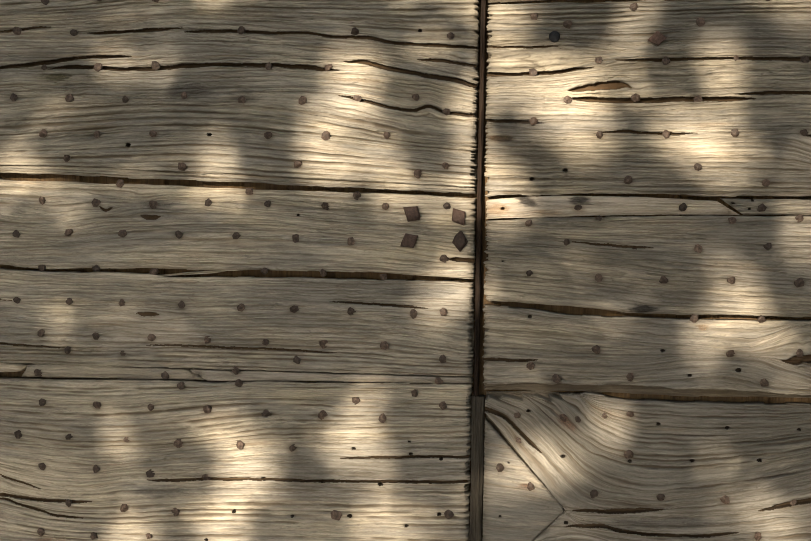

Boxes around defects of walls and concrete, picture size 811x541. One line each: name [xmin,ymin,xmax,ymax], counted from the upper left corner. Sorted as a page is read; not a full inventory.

crack [0,27,811,103]
crack [338,95,544,124]
crack [0,474,92,519]